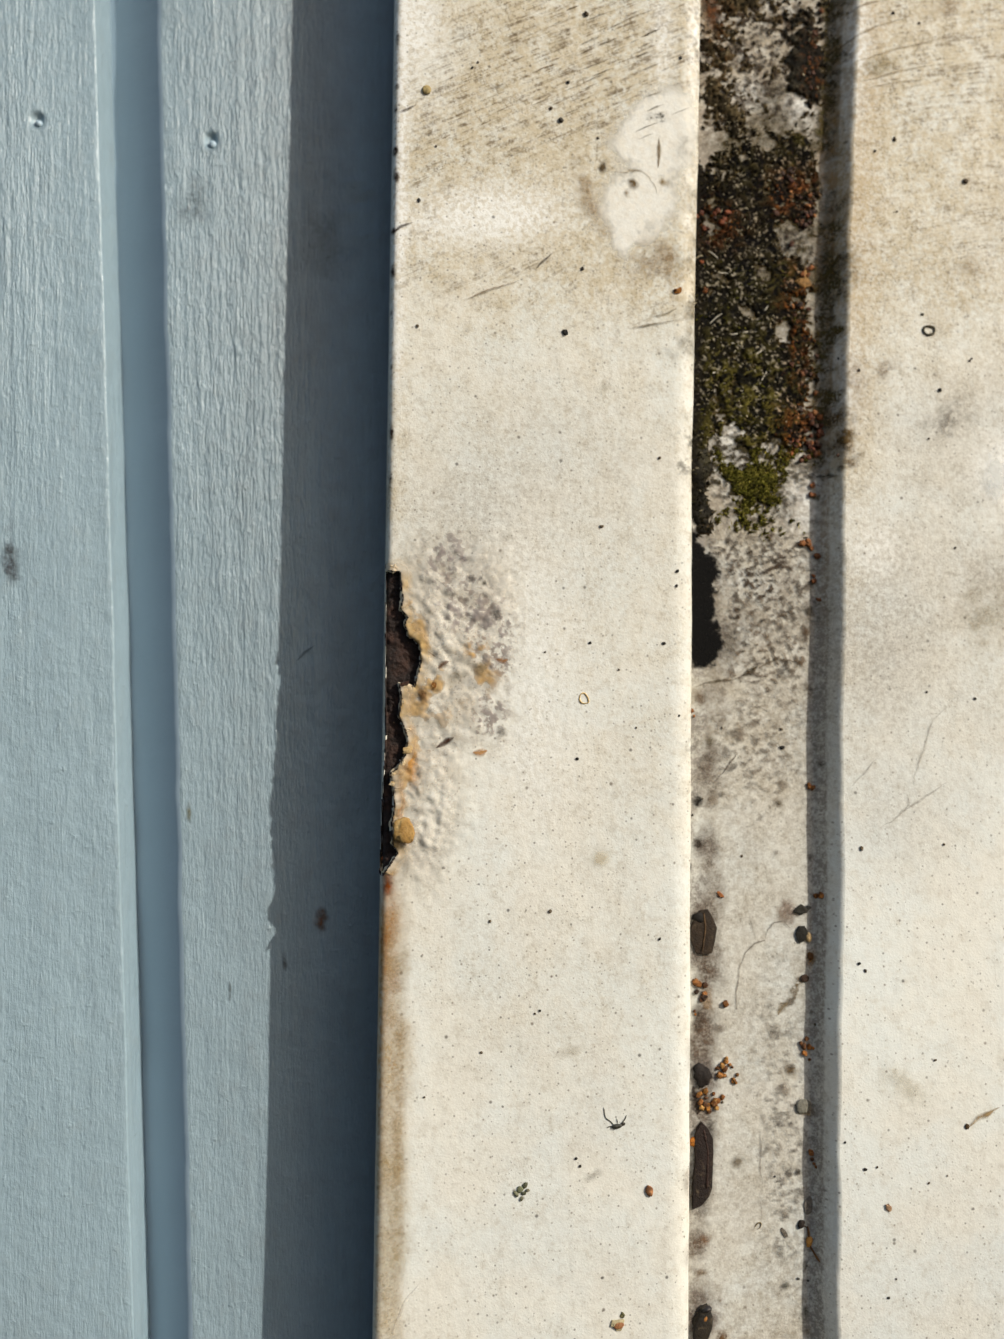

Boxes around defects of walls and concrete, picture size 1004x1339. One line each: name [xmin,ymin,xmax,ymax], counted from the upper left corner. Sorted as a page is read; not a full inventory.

water stain [691,0,832,667]
corrosion [384,911,395,972]